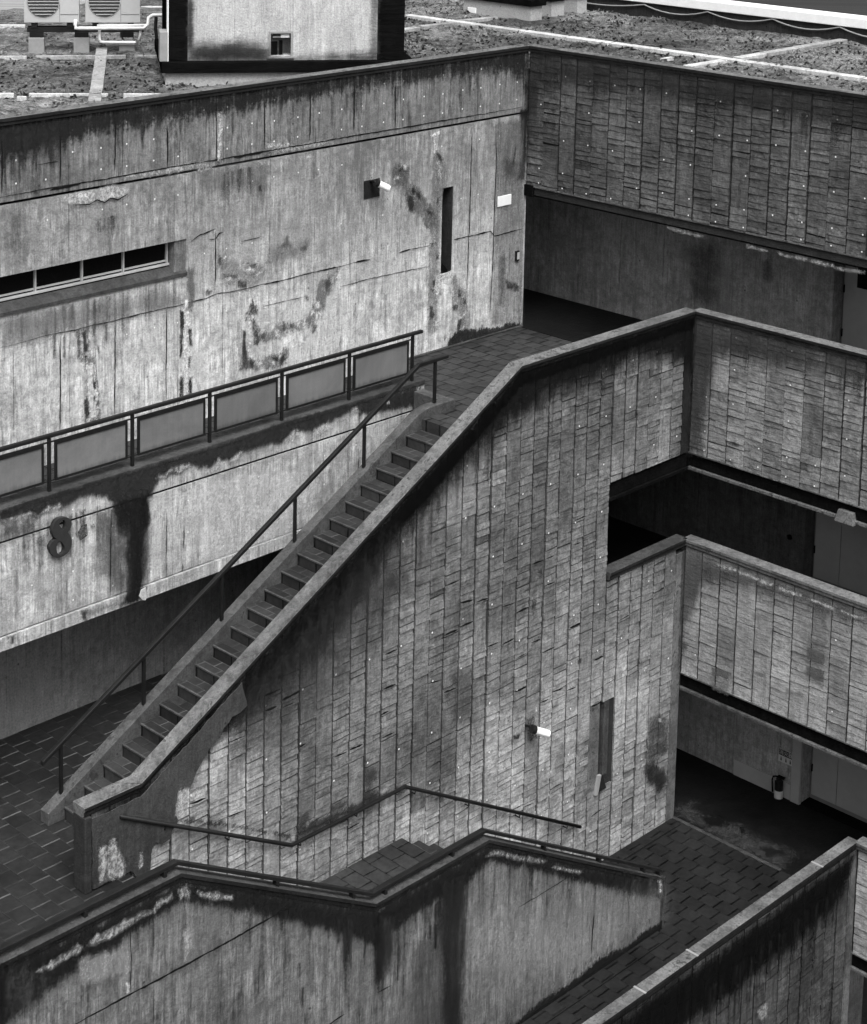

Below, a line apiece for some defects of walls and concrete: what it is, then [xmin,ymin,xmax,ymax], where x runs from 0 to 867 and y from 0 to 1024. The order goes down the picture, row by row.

spalling [64,186,128,205]
leakage [186,0,284,61]
leakage [326,0,378,60]
leakage [0,52,867,179]
crack [1,229,426,424]
leakage [0,386,421,605]
leakage [102,315,867,813]
peeling [91,682,247,889]
leakage [0,844,664,1024]
leakage [603,851,857,1024]